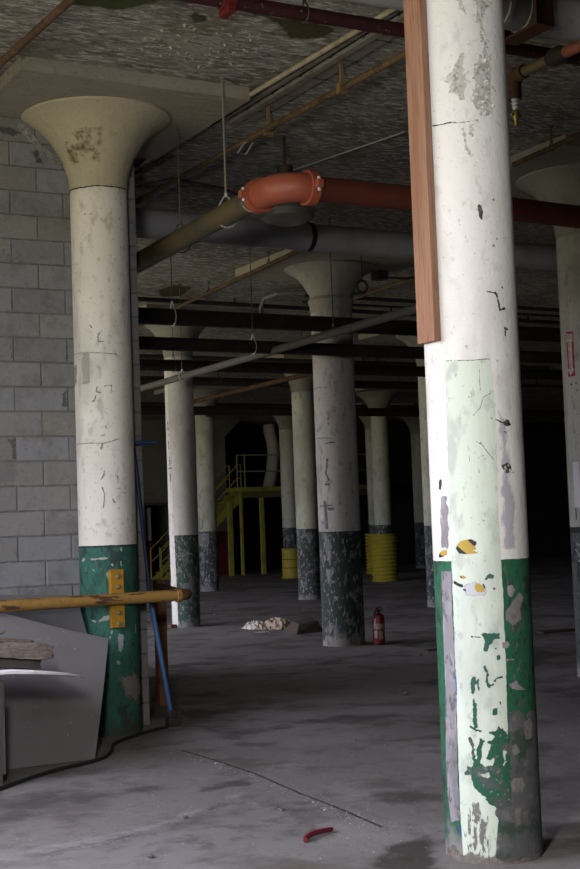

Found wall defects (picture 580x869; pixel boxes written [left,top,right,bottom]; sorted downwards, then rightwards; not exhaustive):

peeling [444,0,495,116]
peeling [462,123,474,157]
peeling [109,631,124,665]
peeling [441,571,542,865]